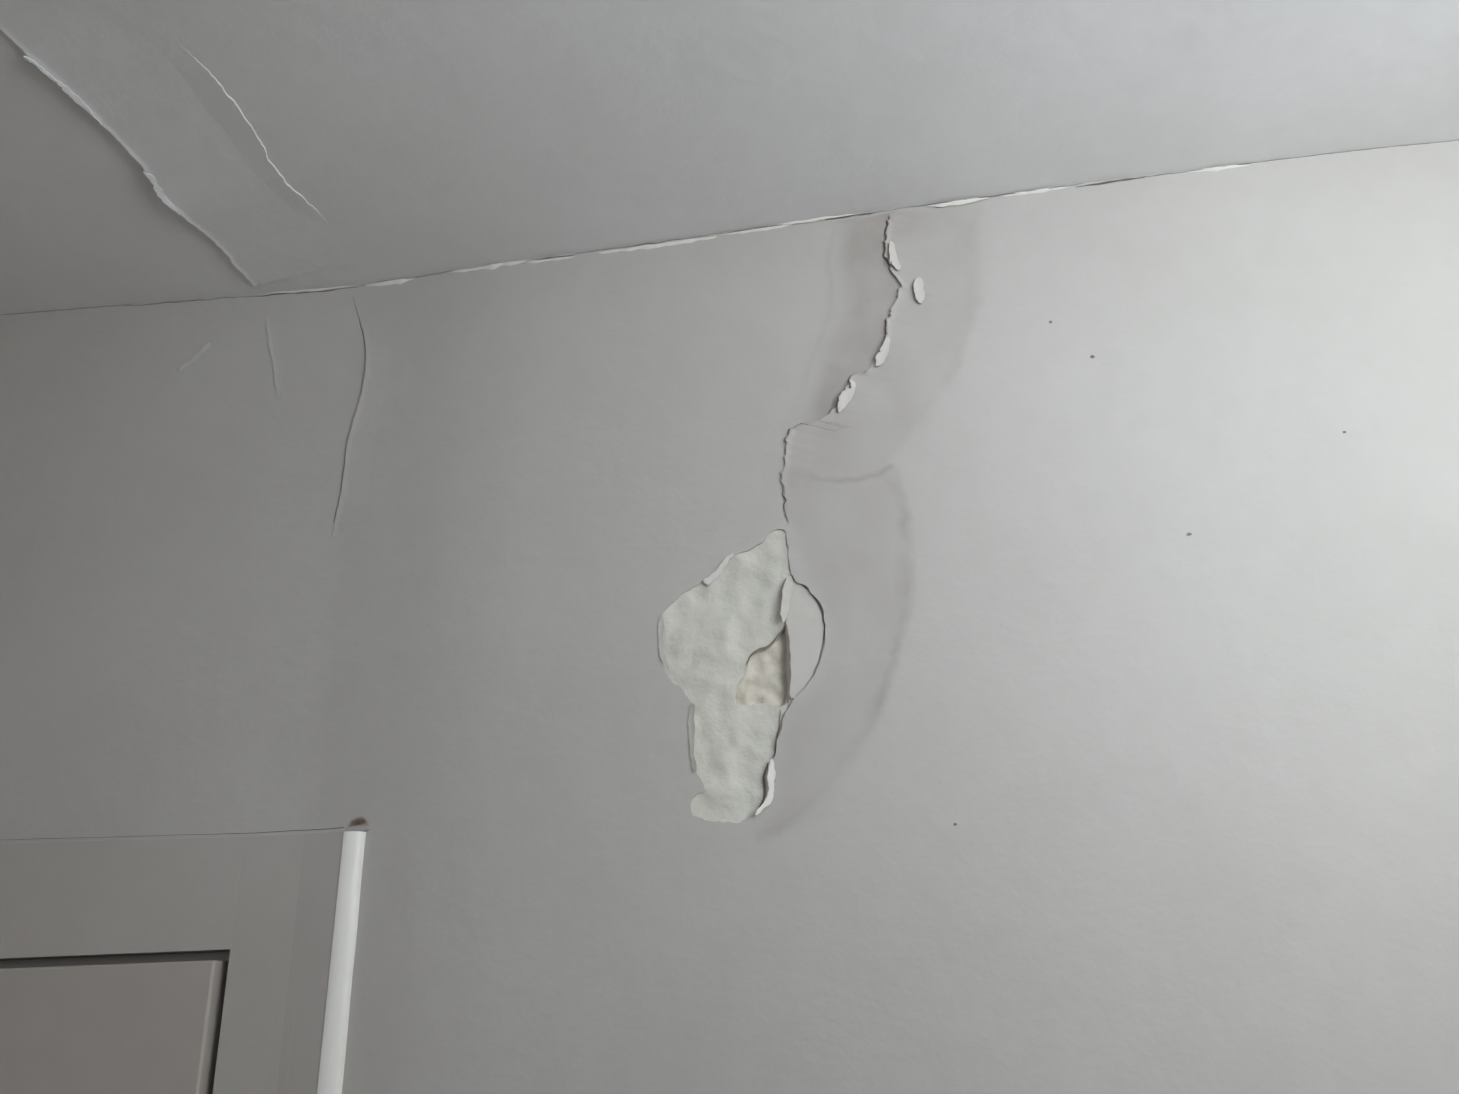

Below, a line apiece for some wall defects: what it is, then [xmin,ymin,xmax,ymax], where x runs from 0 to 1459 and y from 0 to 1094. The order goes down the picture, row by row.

crack [0,0,1457,315]
flaking render [658,213,939,823]